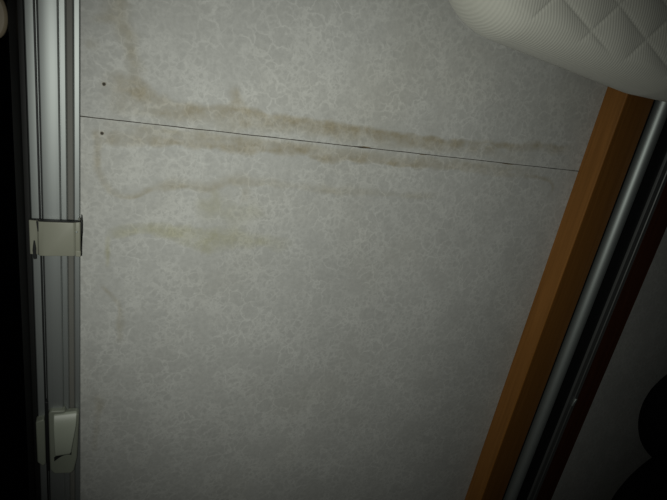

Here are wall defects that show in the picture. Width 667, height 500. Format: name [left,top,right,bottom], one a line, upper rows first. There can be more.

leakage [82,0,579,270]